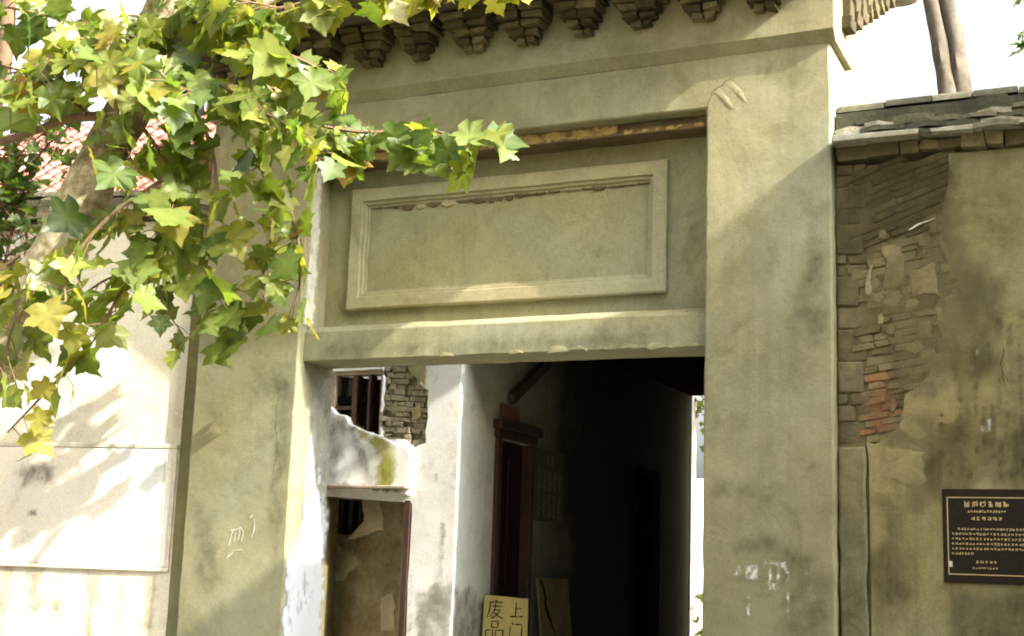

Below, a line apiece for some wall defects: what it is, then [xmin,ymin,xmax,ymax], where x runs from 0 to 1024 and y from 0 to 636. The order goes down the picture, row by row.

flaking render [846,150,968,486]
spalling [548,345,607,353]
spalling [621,342,700,350]
flaking render [379,355,428,447]
leakage [373,453,397,492]
peeling [335,499,384,582]
peeling [380,591,397,631]